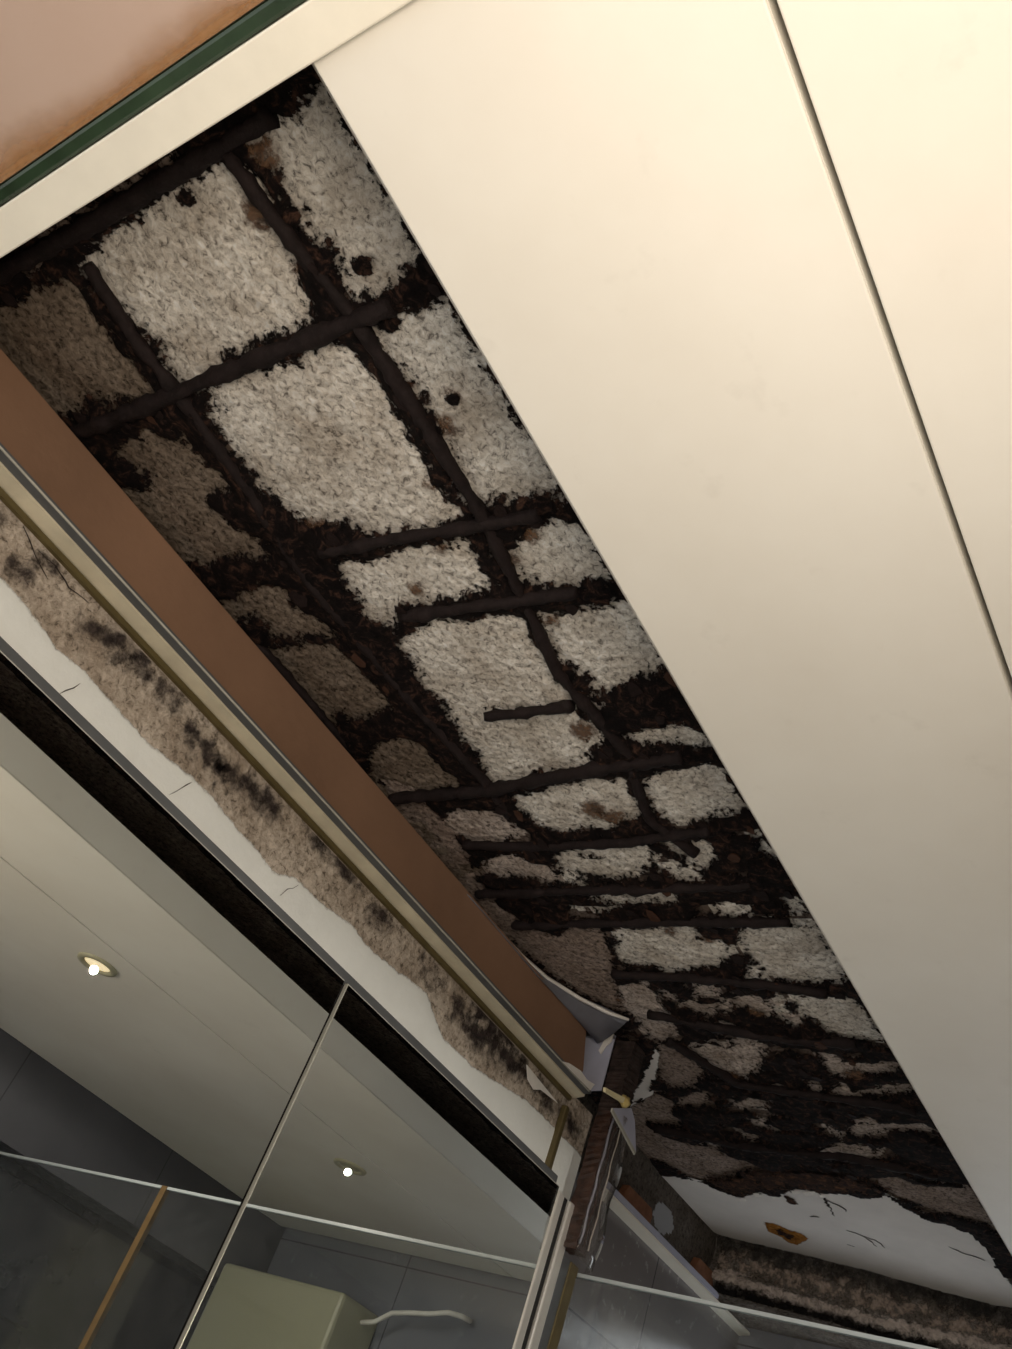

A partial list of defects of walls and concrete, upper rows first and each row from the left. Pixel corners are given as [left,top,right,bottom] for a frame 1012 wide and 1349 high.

rust [0,161,227,393]
rust [0,64,389,262]
spalling [0,82,421,392]
rust [57,390,138,429]
leakage [5,553,59,585]
leakage [82,620,281,820]
leakage [310,832,358,885]
spalling [0,273,1012,1308]
rust [80,135,1012,1279]
leakage [713,1282,951,1349]
spalling [712,1249,1012,1349]
leakage [717,1235,1012,1329]